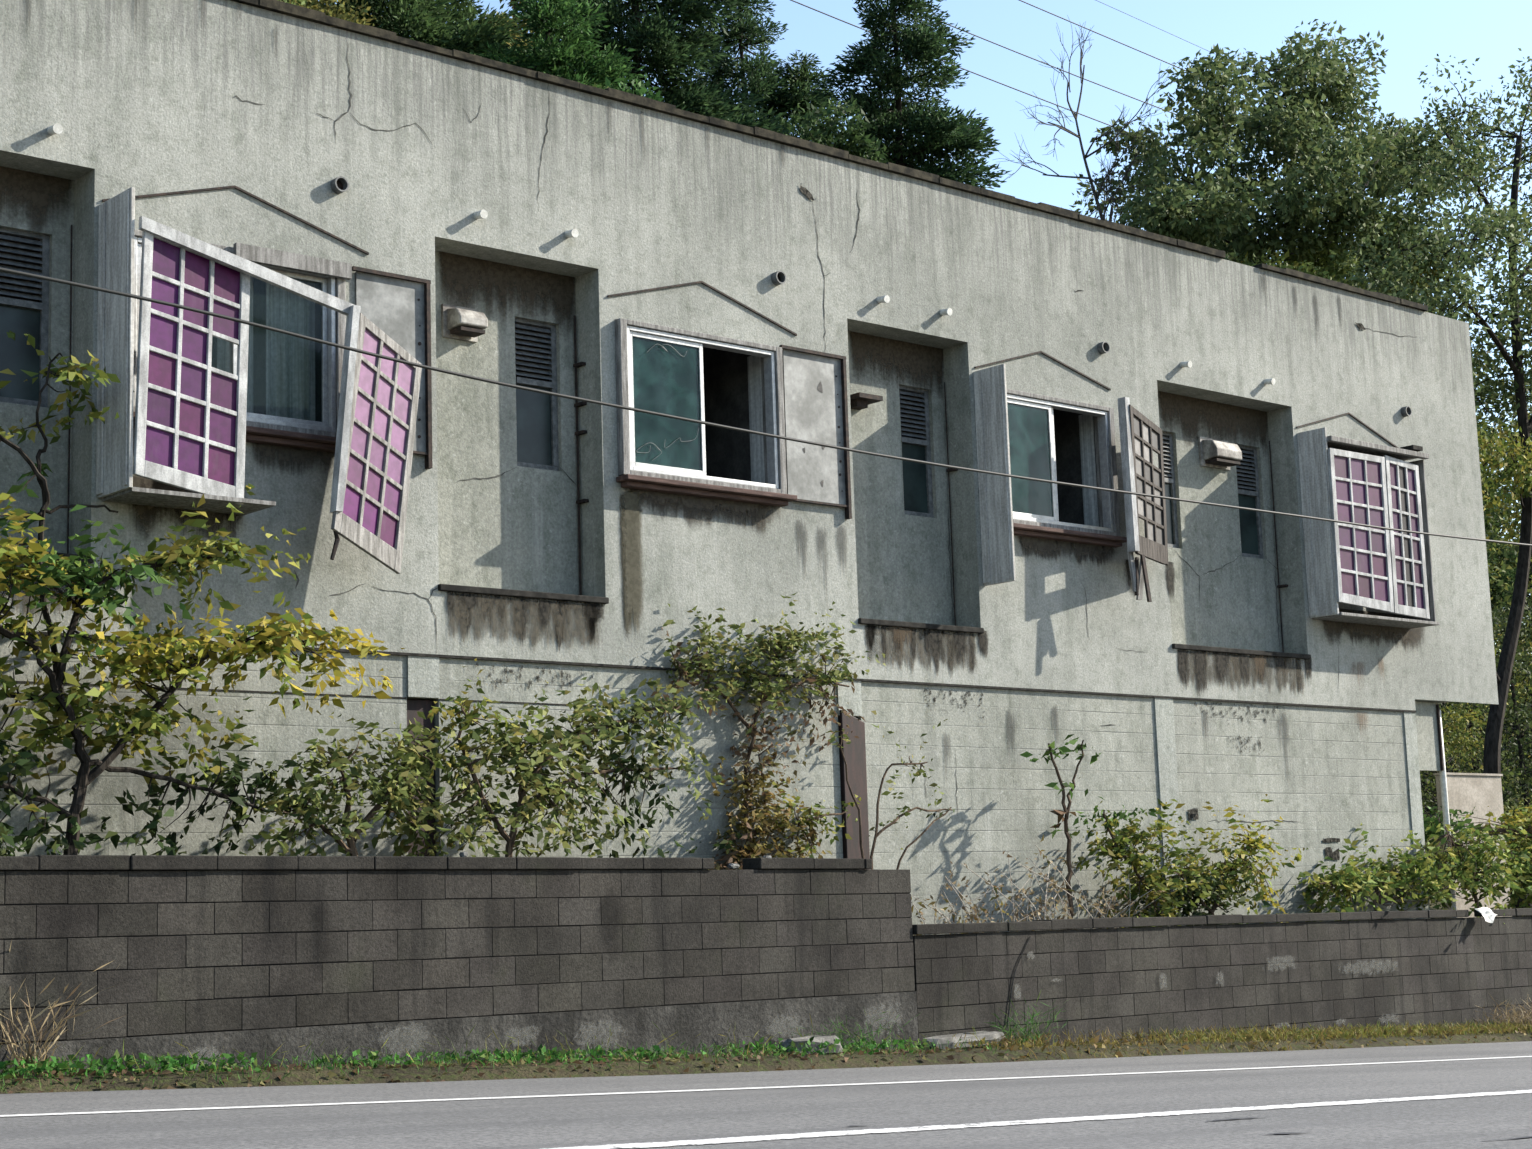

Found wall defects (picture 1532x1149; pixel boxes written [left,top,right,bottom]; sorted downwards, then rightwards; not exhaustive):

crack [317,42,432,144]
damp [620,489,777,631]
damp [797,521,847,585]
damp [447,591,604,650]
damp [472,664,593,692]
damp [866,625,988,712]
damp [1007,712,1015,749]
damp [1178,649,1312,775]